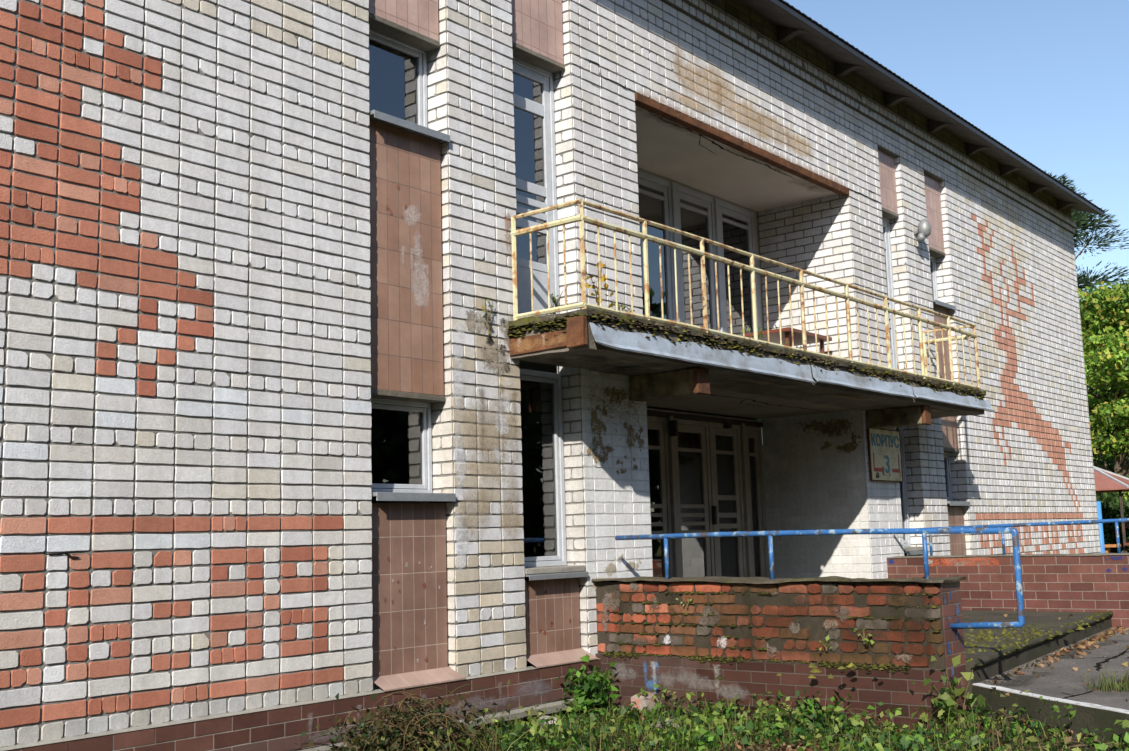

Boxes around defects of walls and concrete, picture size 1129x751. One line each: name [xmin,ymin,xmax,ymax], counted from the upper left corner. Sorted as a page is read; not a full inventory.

peeling [586,385,644,474]
peeling [797,417,861,453]
crack [1061,648,1129,699]